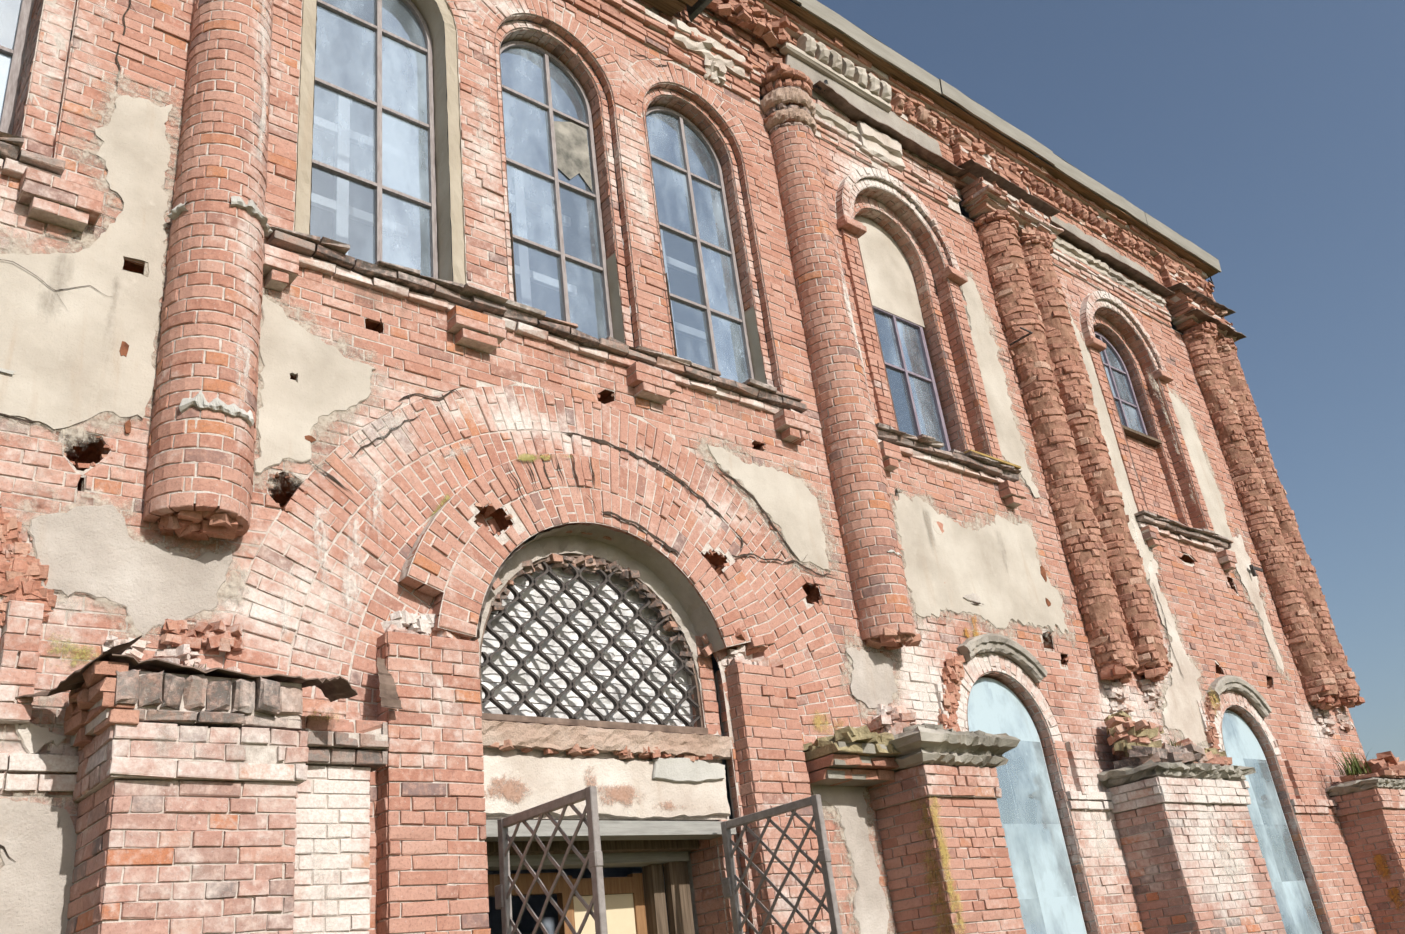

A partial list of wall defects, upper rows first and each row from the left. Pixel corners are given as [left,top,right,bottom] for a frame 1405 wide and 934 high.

crack [116,0,136,88]
peeling [0,73,182,449]
peeling [0,490,249,664]
peeling [253,290,378,490]
crack [310,389,463,493]
peeling [697,438,842,590]
peeling [891,489,1075,647]
peeling [1067,303,1221,752]
peeling [2,696,67,755]
peeling [842,629,916,726]
spalling [937,655,966,732]
peeling [0,774,79,934]